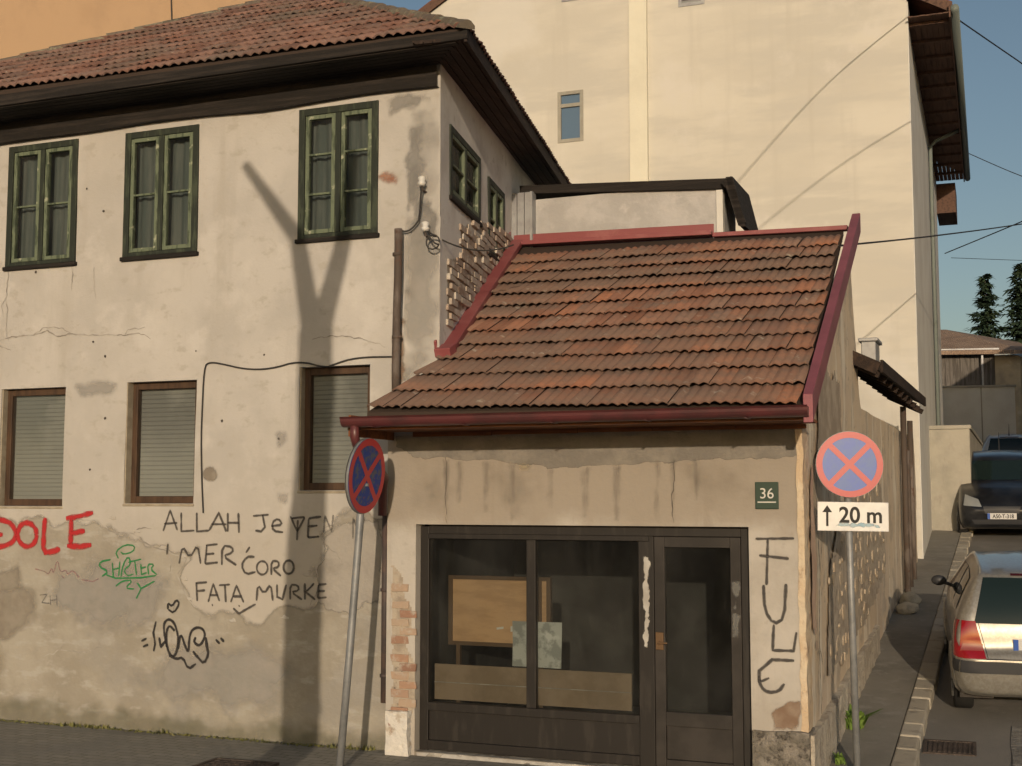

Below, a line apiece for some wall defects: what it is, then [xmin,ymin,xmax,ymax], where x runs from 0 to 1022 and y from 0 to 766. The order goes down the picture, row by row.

crack [0,271,150,350]
crack [312,335,384,347]
flaking render [446,220,513,328]
damp [0,568,34,639]
flaking render [0,509,417,750]